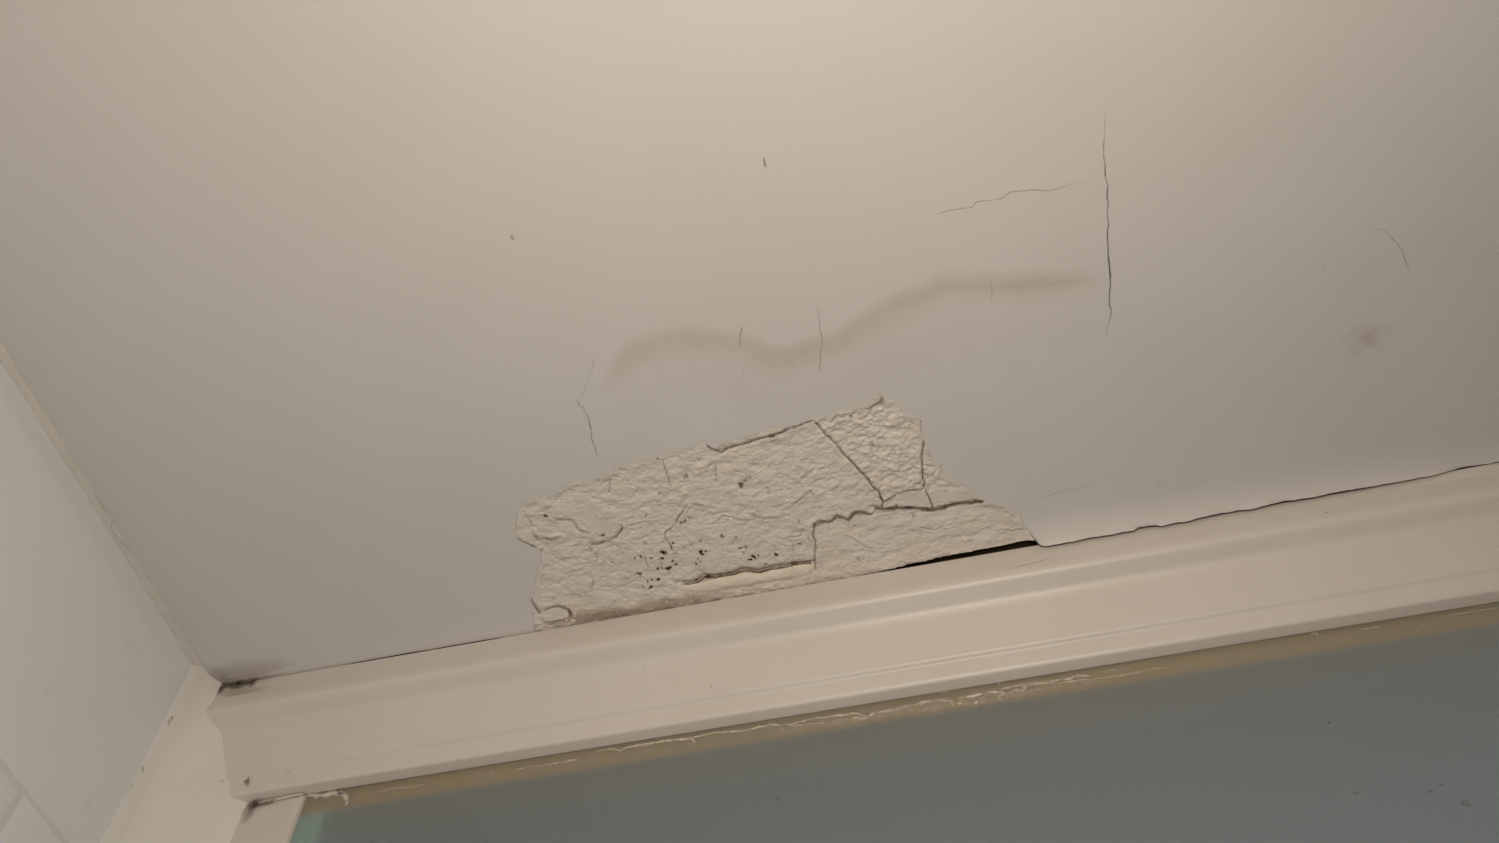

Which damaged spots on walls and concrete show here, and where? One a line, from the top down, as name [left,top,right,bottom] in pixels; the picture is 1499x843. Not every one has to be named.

peeling [515,394,1499,632]